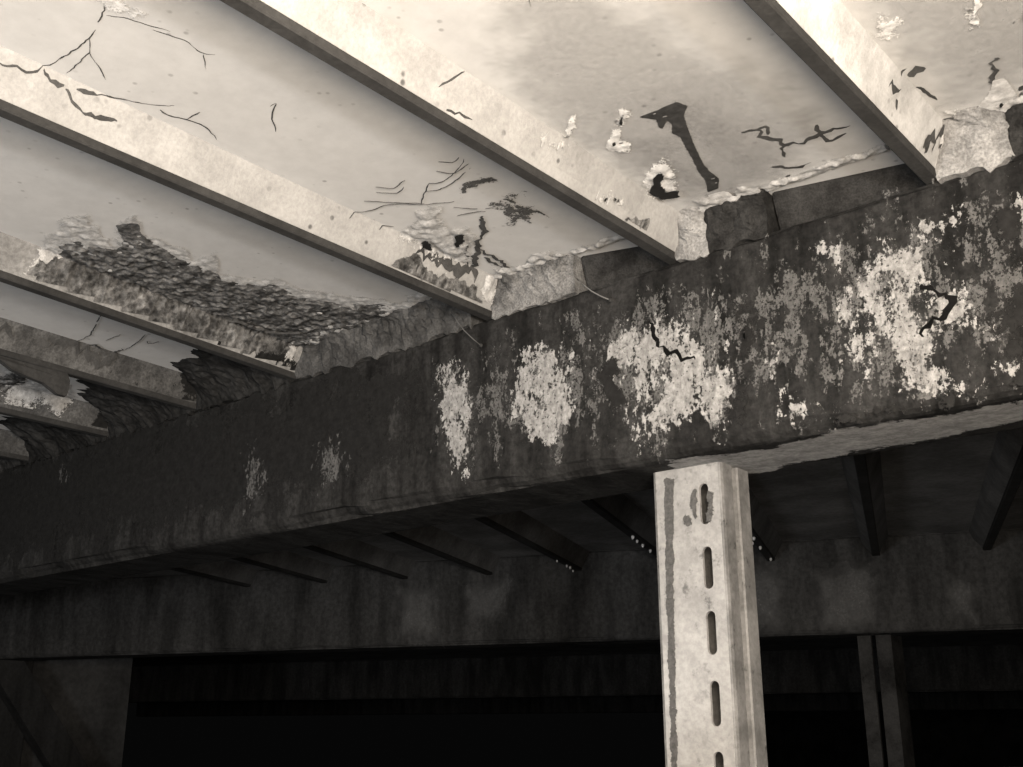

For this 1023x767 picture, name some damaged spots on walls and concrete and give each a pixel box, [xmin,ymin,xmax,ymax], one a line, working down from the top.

crack [0,5,217,140]
crack [439,71,472,120]
peeling [978,79,1023,112]
spalling [606,102,732,212]
crack [741,124,849,177]
crack [350,157,509,283]
spalling [24,215,399,355]
crack [919,284,957,337]
spalling [0,367,76,418]
leakage [0,175,1023,573]
leakage [755,576,776,621]